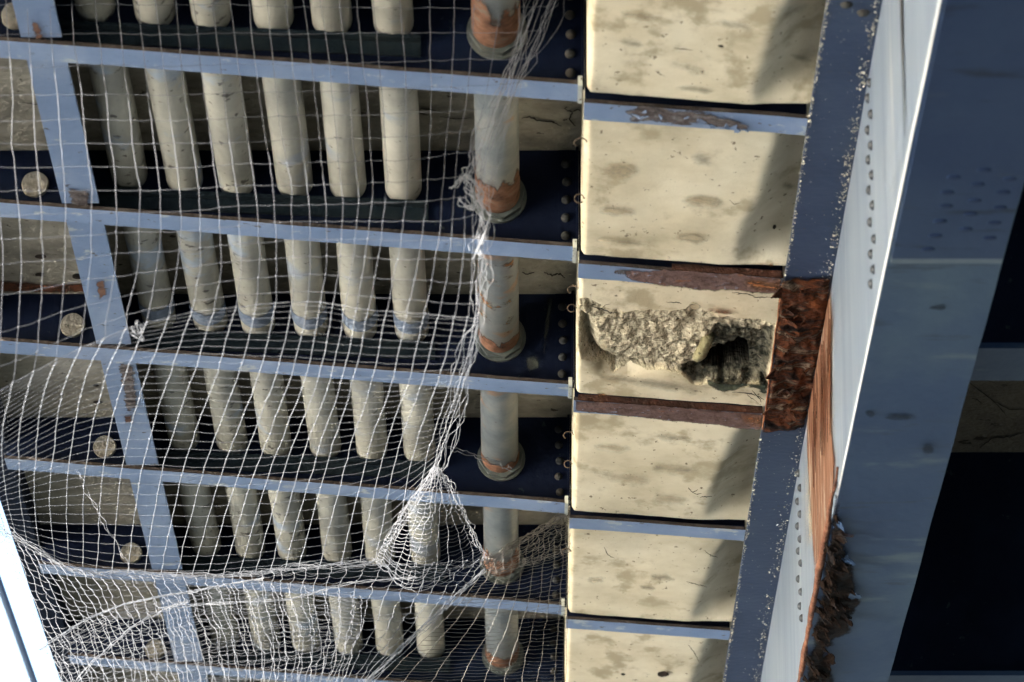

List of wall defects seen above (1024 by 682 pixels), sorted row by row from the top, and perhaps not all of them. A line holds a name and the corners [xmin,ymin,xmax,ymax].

rust [471,0,520,48]
peeling [626,106,749,133]
rust [475,169,520,213]
spalling [577,296,776,389]
rust [576,263,862,682]